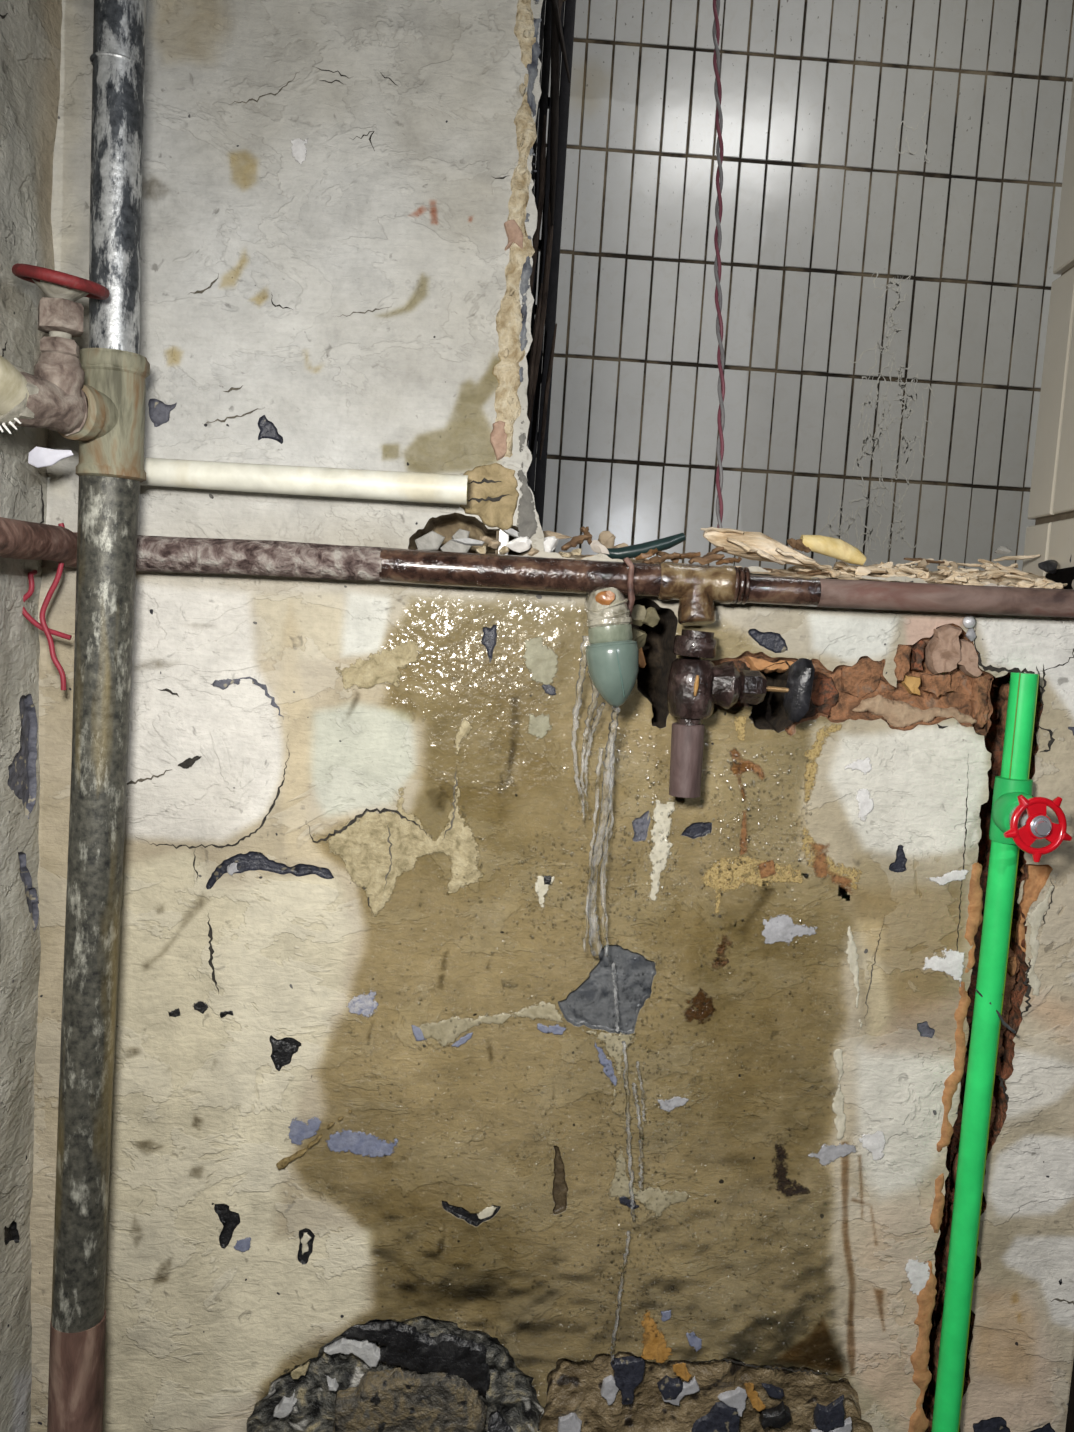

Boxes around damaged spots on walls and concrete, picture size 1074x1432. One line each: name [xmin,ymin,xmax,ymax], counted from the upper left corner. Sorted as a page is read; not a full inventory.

spalling [408,0,542,556]
spalling [1045,567,1074,589]
flaking render [710,623,994,736]
crack [135,677,290,878]
corrosion [730,716,764,856]
leakage [702,724,862,913]
crack [168,913,233,1018]
spalling [411,944,656,1101]
flaking render [922,862,983,1152]
leakage [773,1144,810,1196]
spalling [246,1316,873,1432]
flaking render [905,1256,937,1432]